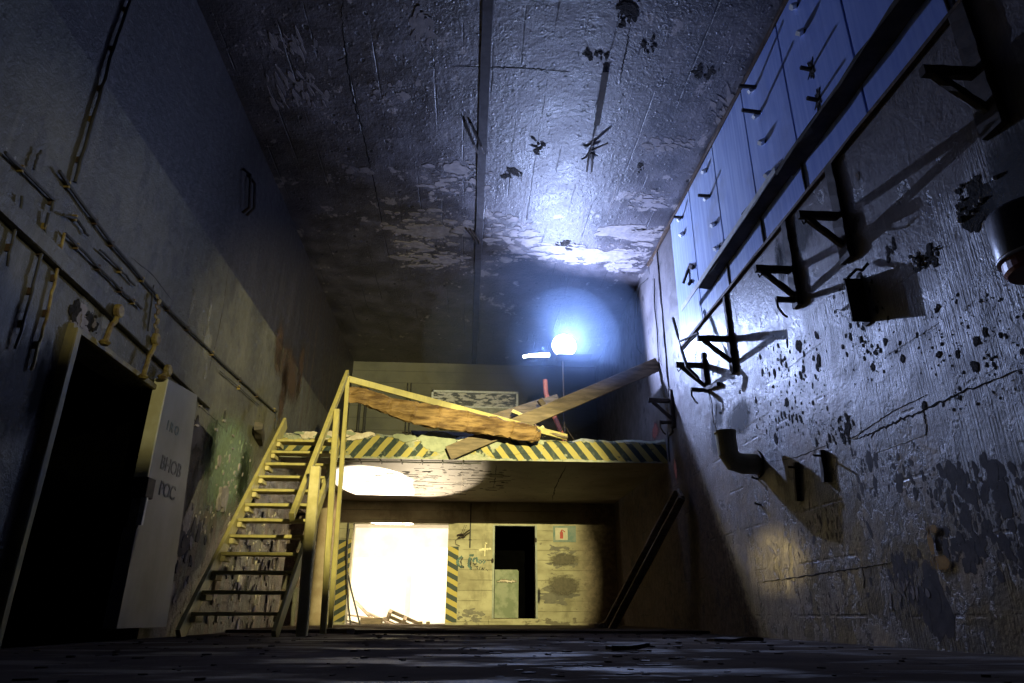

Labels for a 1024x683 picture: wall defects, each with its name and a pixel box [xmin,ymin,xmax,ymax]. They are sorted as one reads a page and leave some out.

spalling [616,1,640,28]
peeling [381,160,671,272]
spalling [955,175,997,233]
spalling [908,243,940,273]
spalling [68,299,99,335]
corrosion [275,327,304,423]
crack [770,369,1021,462]
flaking render [171,402,280,629]
leakage [538,554,578,603]
crack [757,562,891,586]